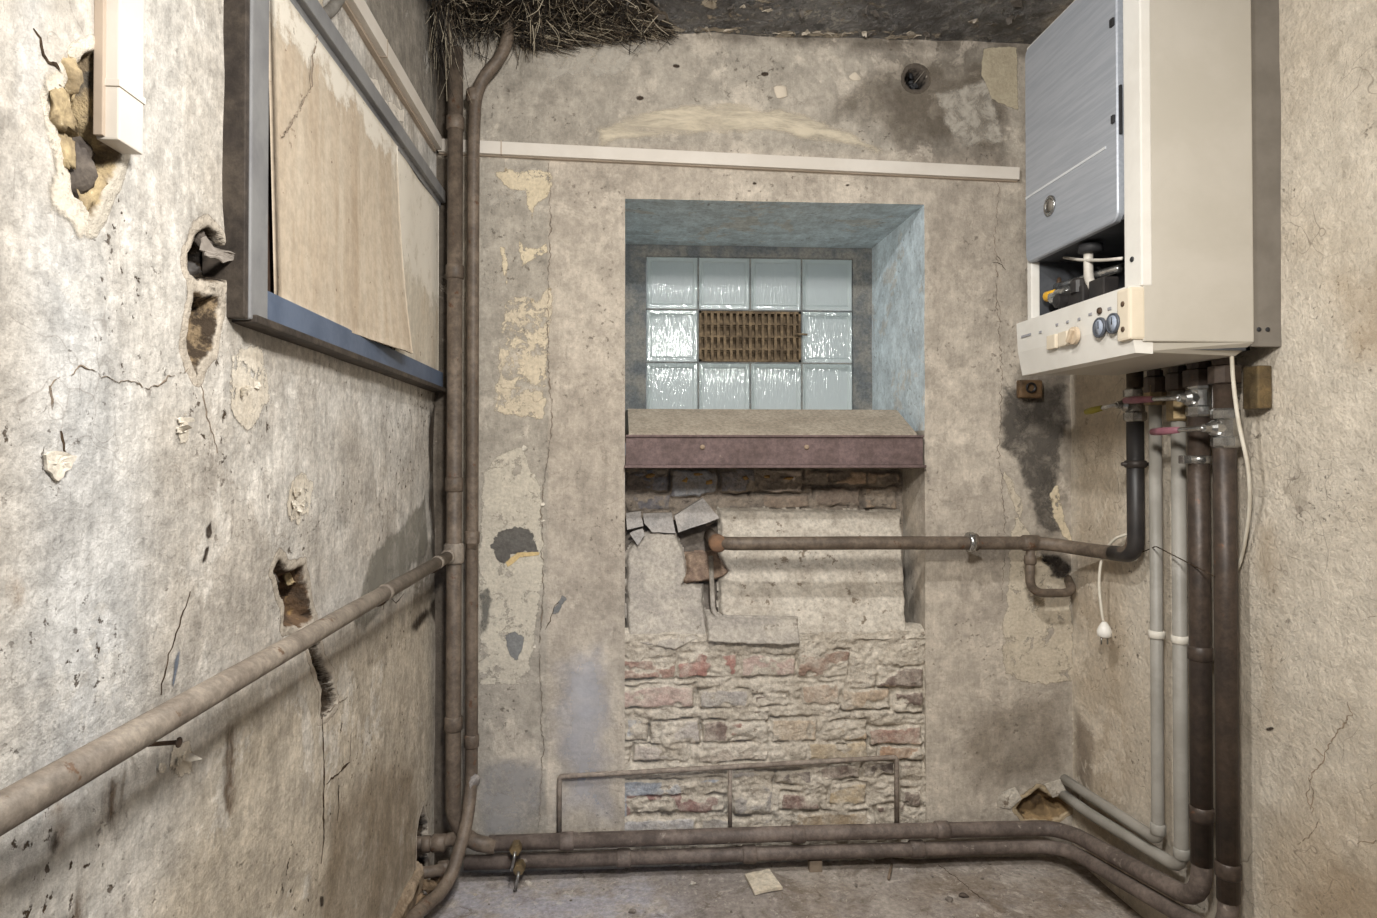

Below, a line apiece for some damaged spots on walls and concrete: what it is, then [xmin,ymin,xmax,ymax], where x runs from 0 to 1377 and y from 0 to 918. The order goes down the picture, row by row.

spalling [423,0,940,103]
spalling [40,34,130,239]
spalling [178,214,270,431]
peeling [494,241,553,420]
crack [49,364,218,453]
spalling [268,548,318,637]
peeling [478,445,545,685]
spalling [626,511,675,545]
damp [1001,385,1068,531]
spalling [305,640,340,726]
crack [321,697,351,864]
spalling [997,779,1073,822]